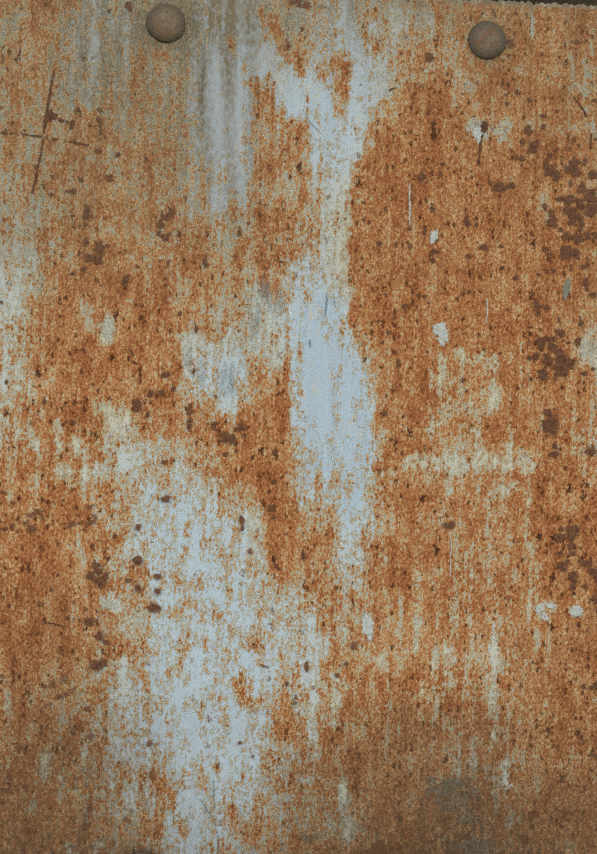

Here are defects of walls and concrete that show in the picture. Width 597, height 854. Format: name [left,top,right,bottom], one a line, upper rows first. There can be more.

rust [0,0,404,854]
rust [250,0,597,854]